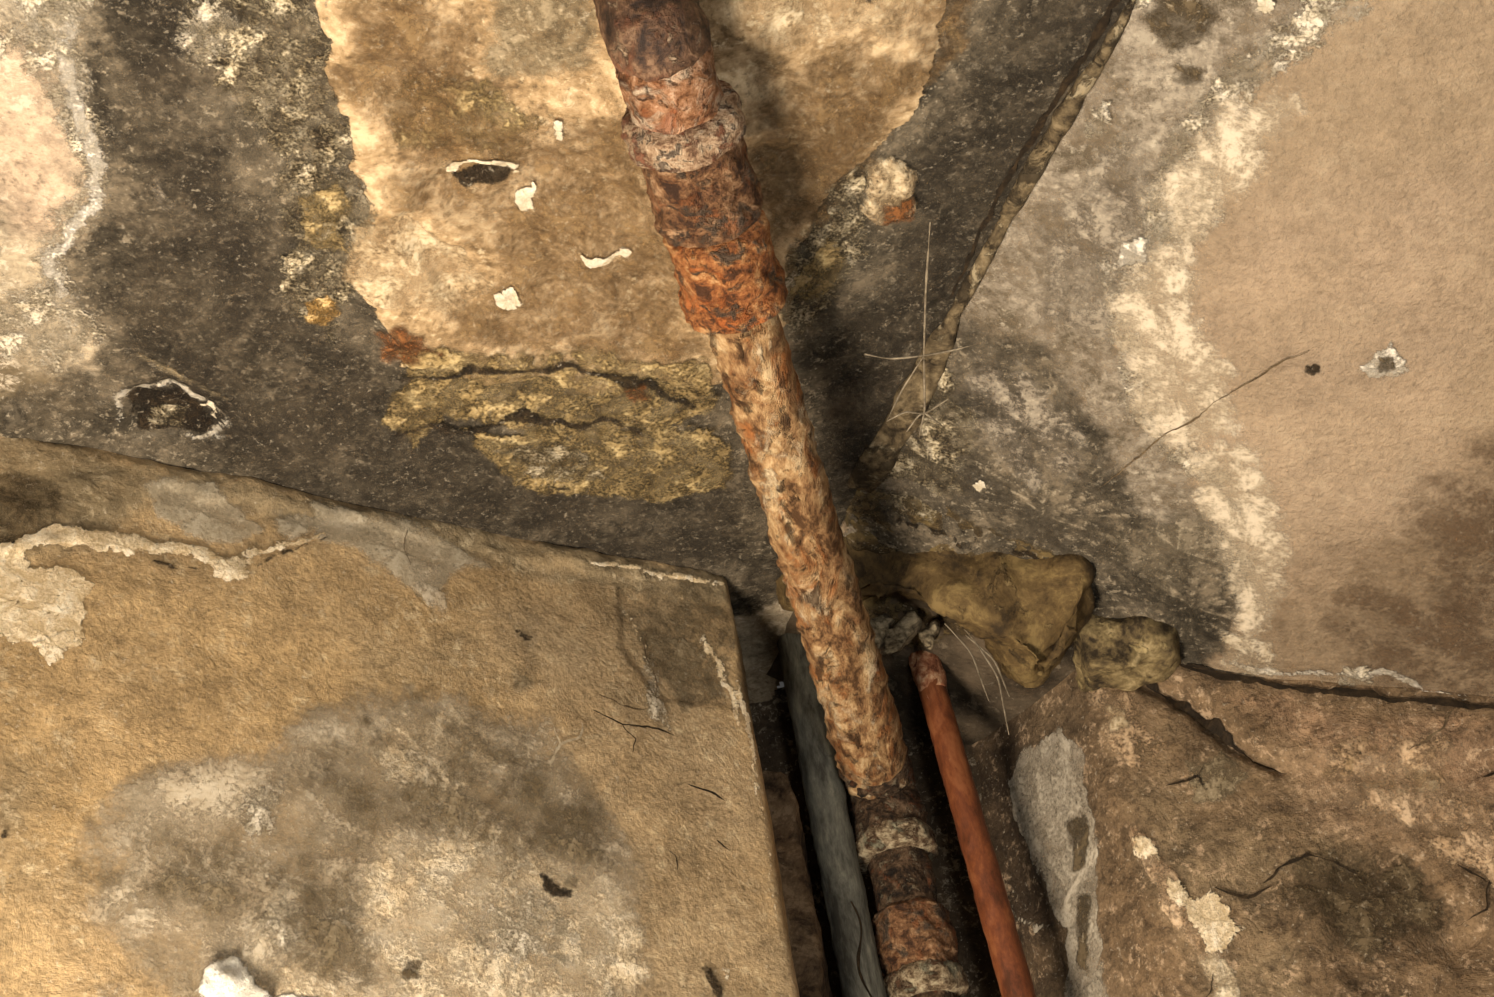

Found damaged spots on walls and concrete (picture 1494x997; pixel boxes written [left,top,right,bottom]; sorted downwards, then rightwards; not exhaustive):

damp [0,0,783,616]
spalling [170,0,733,503]
spalling [699,0,968,335]
crack [949,0,1120,299]
damp [783,0,1373,666]
crack [1101,340,1328,487]
peeling [0,523,326,666]
damp [71,690,651,997]
crack [1146,664,1494,786]
damp [1335,486,1494,693]